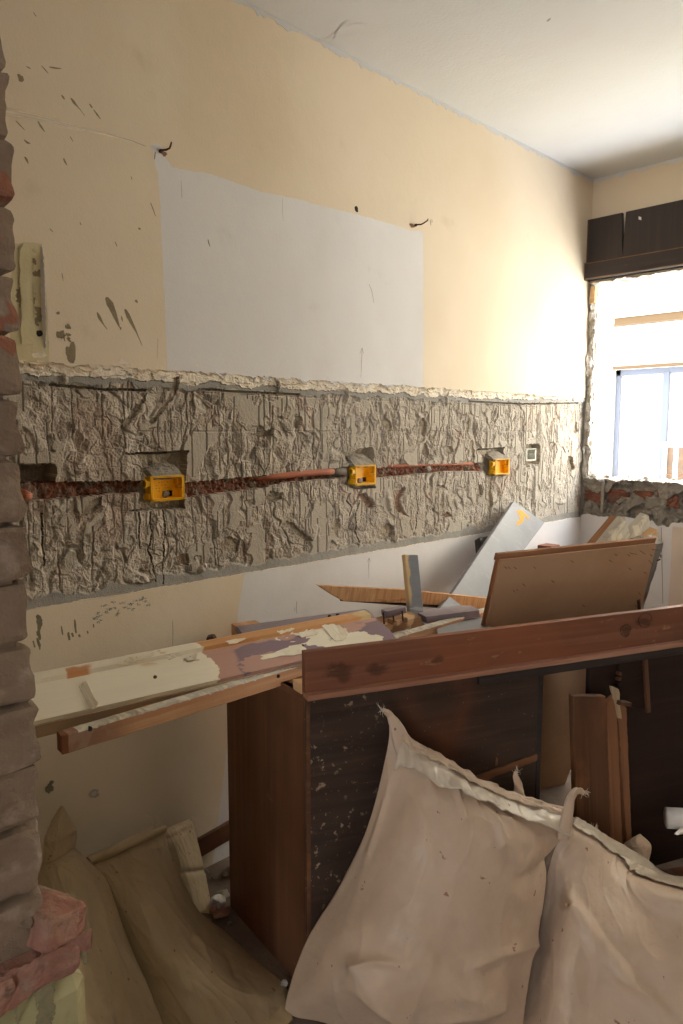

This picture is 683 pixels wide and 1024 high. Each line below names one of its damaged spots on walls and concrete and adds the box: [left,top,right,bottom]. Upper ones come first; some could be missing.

spalling [3,245,683,610]